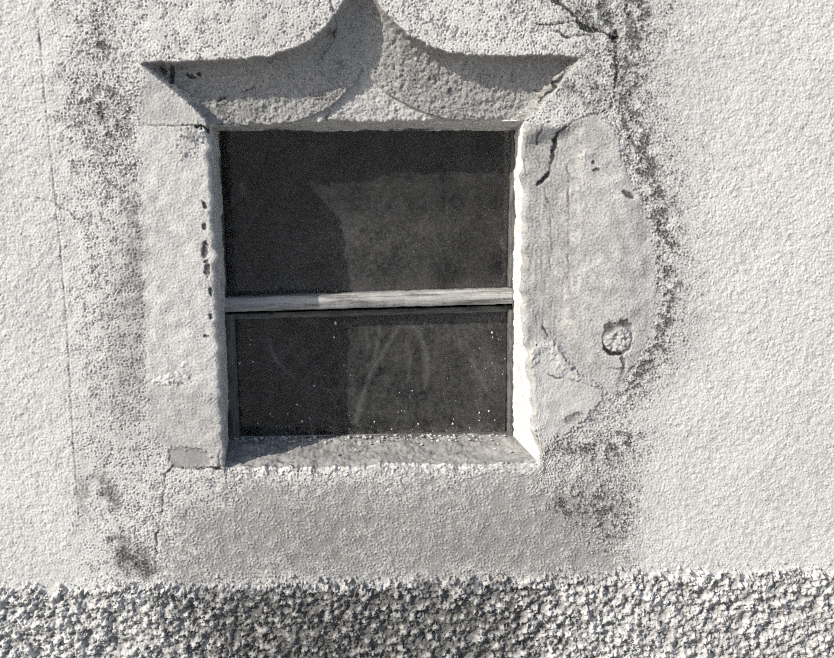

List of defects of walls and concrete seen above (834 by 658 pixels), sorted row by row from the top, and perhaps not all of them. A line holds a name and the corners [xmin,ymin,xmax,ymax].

crack [535,0,619,112]
crack [536,122,572,199]
spalling [554,0,705,411]
crack [162,454,221,503]
spalling [553,420,659,560]